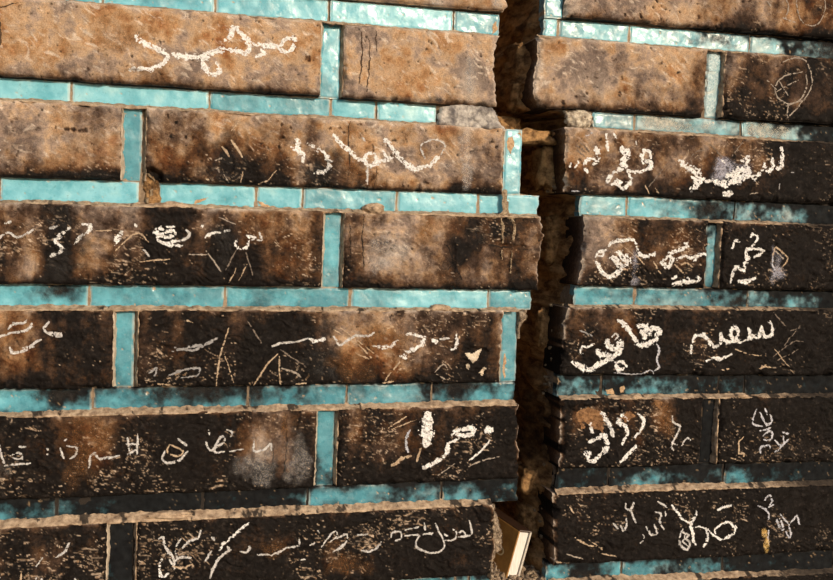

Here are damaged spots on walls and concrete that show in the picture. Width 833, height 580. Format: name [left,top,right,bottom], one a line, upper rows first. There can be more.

crack [0,2,21,45]
crack [359,31,377,92]
crack [470,0,576,574]